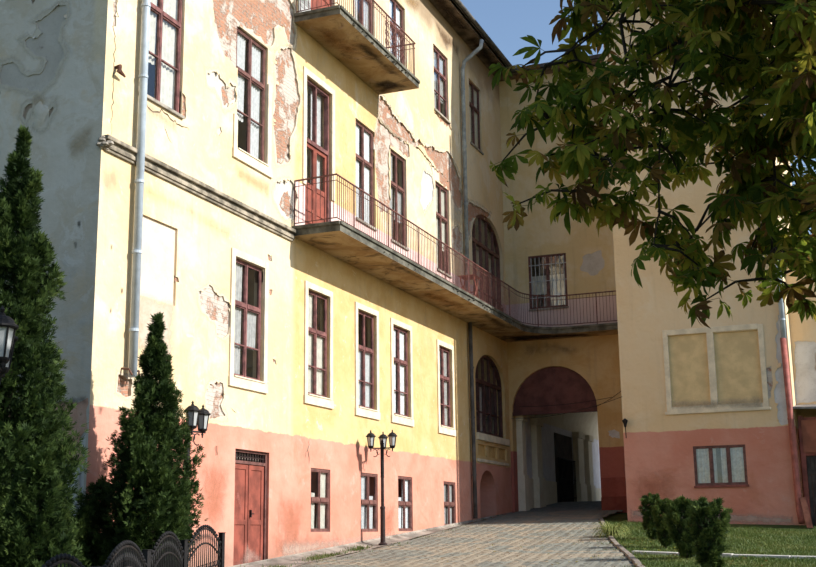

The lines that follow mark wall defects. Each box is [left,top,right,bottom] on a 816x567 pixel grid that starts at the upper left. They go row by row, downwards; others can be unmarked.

flaking render [0,2,70,135]
flaking render [206,69,237,112]
flaking render [213,0,301,166]
flaking render [272,177,298,221]
flaking render [369,94,491,255]
flaking render [197,283,231,340]
flaking render [116,372,134,399]
flaking render [205,378,228,421]
flaking render [766,315,816,425]